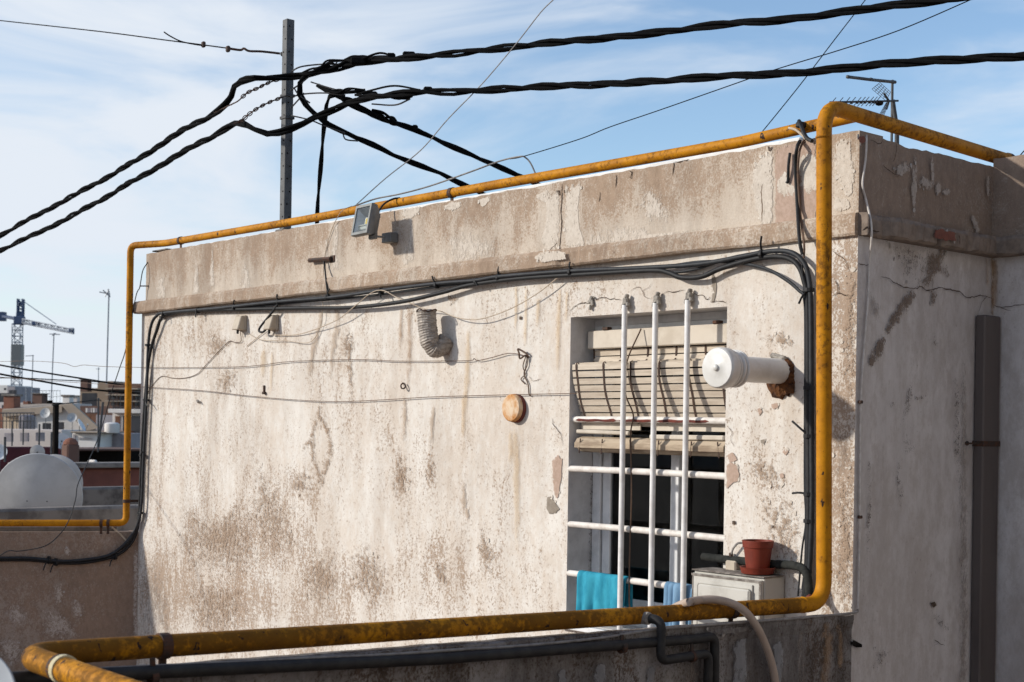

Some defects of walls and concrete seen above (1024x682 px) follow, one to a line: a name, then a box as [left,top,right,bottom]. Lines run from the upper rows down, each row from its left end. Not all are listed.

peeling [893,157,950,217]
crack [550,194,562,250]
spalling [534,249,566,262]
crack [832,250,1023,312]
spalling [547,455,562,514]
peeling [726,439,803,576]